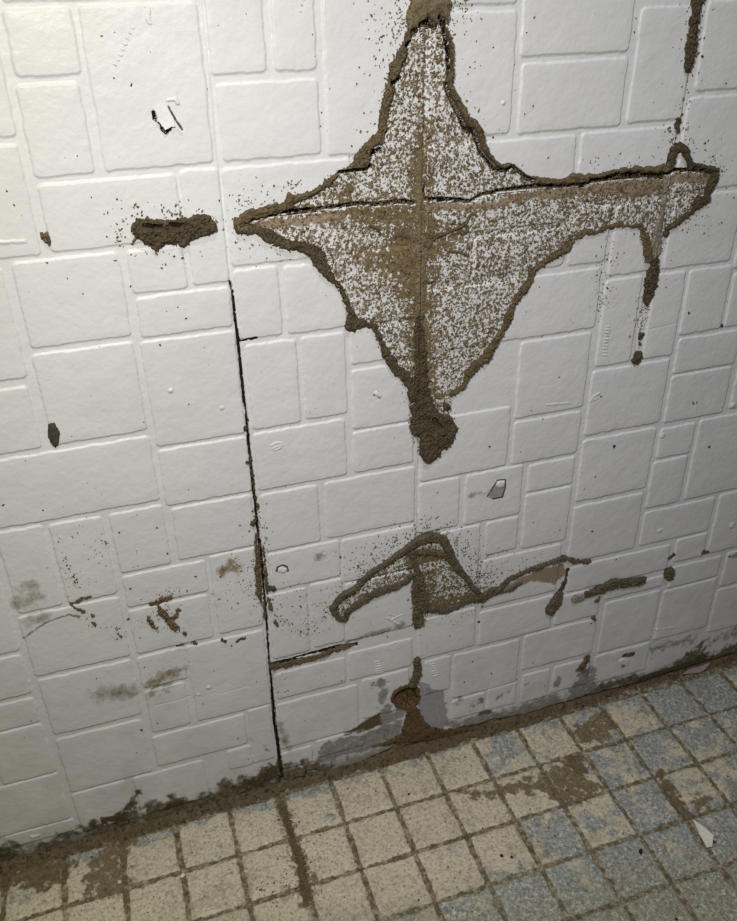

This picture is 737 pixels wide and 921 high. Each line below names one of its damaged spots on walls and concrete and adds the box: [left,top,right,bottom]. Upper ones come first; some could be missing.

peeling [151,96,183,135]
crack [251,166,707,220]
peeling [487,479,506,499]
crack [229,280,404,782]